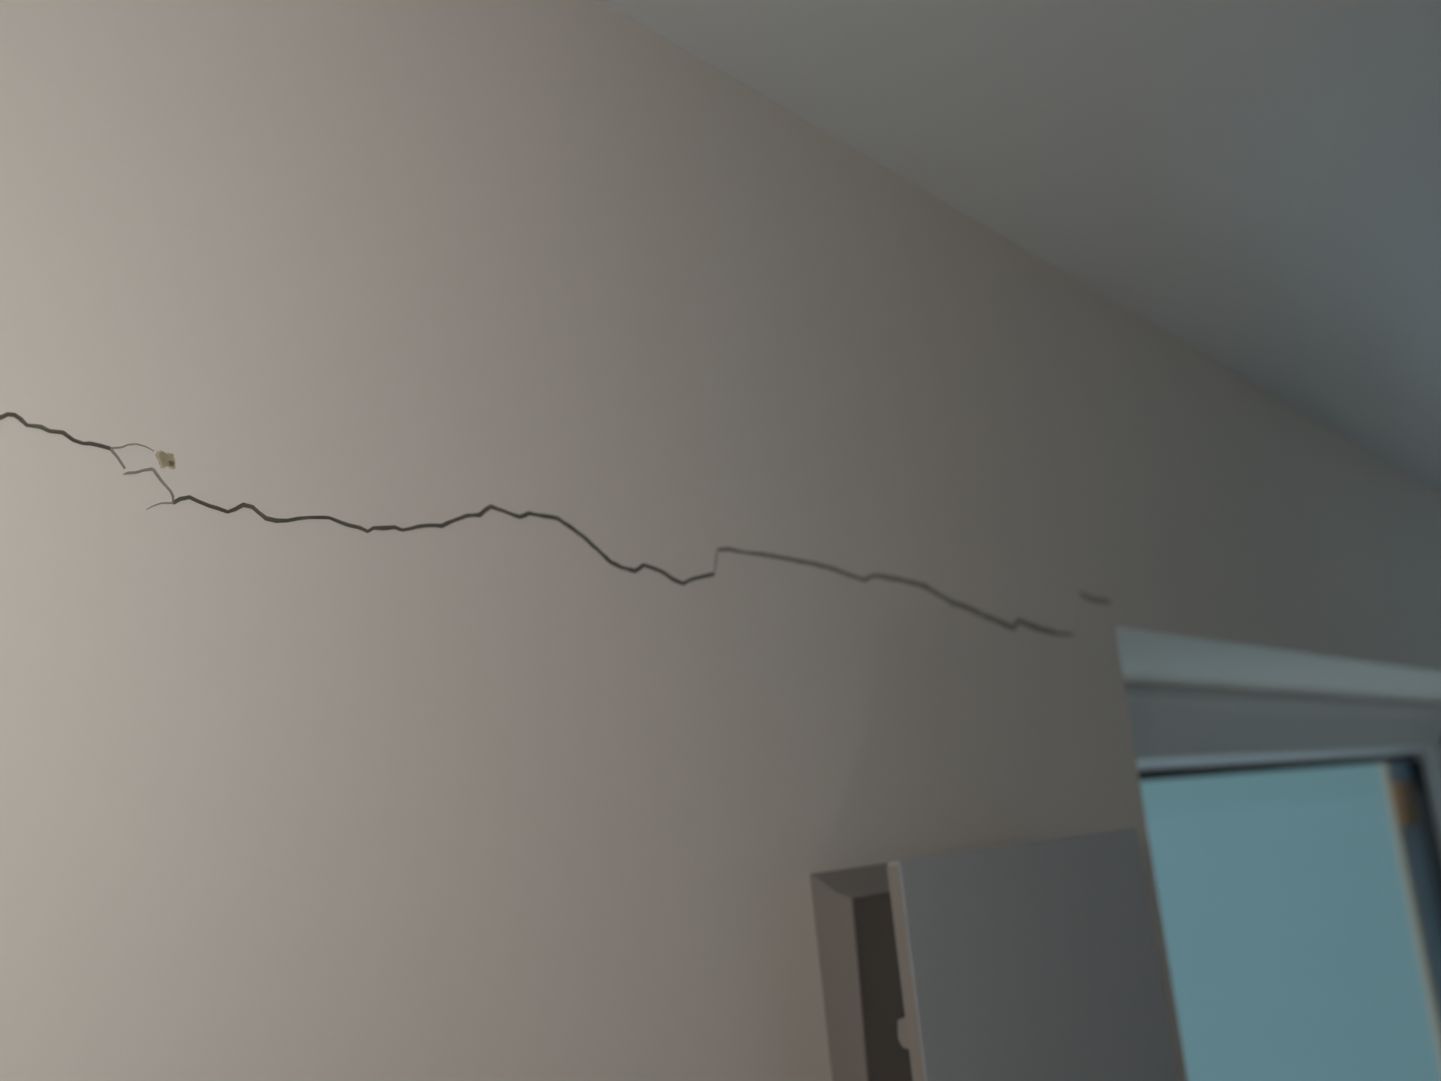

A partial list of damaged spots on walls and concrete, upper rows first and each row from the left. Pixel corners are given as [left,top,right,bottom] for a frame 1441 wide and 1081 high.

crack [0,412,1111,636]